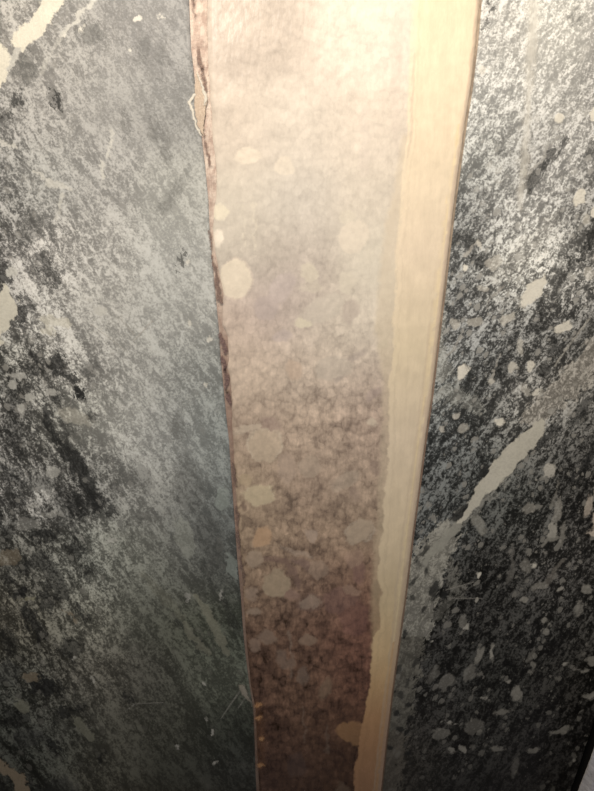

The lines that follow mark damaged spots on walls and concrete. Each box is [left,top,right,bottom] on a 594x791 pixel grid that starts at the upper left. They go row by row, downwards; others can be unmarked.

spalling [188,48,210,165]